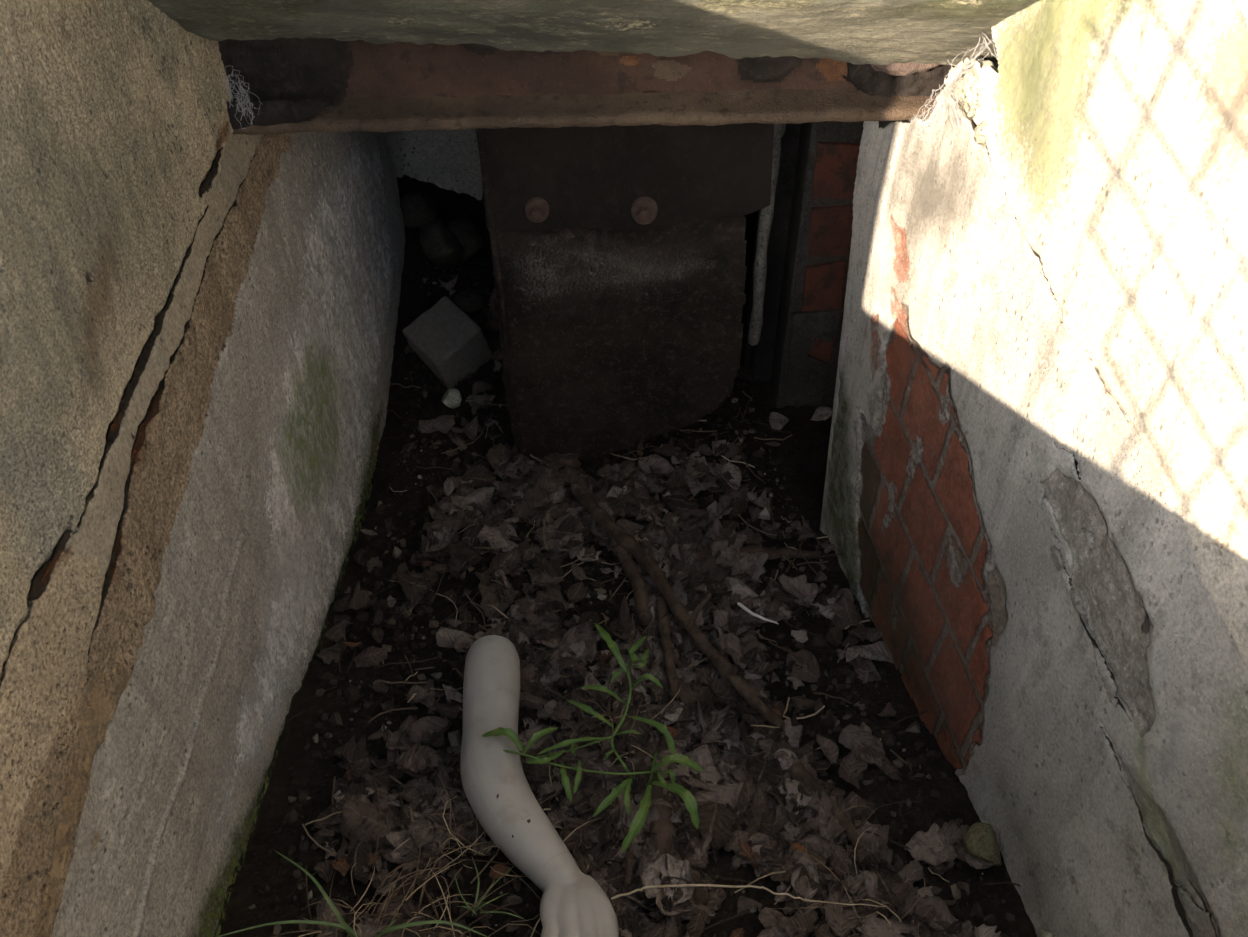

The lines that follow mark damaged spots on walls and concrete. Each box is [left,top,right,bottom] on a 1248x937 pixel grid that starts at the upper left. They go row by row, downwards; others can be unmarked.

rust [735,56,848,83]
crack [0,122,255,687]
water stain [214,132,394,822]
flaking render [854,217,1008,775]
spalling [1028,446,1155,736]
crack [1102,728,1220,937]